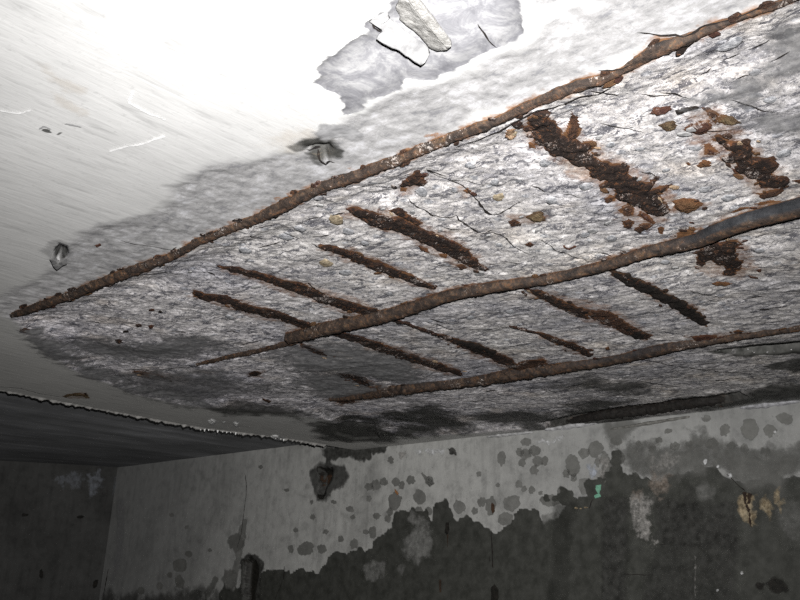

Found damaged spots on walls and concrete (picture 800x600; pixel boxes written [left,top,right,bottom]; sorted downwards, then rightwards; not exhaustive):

corrosion [192,290,316,330]
corrosion [216,265,380,319]
corrosion [318,244,475,295]
spalling [0,0,800,437]
corrosion [346,206,490,273]
crack [408,170,528,254]
corrosion [521,288,654,340]
corrosion [505,107,708,238]
corrosion [598,256,751,341]
corrosion [649,106,800,213]
corrosion [693,237,761,286]
water stain [0,328,800,600]